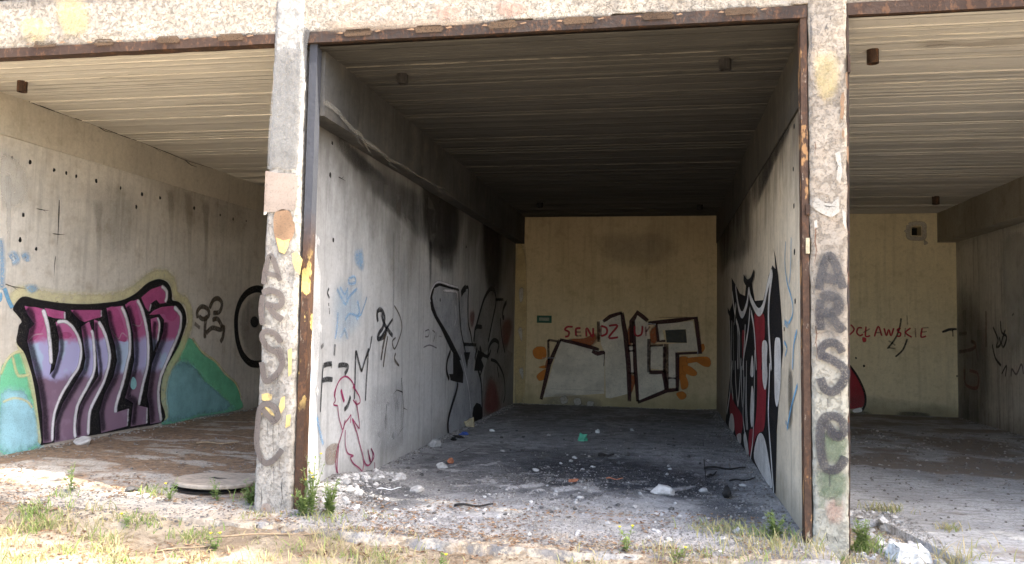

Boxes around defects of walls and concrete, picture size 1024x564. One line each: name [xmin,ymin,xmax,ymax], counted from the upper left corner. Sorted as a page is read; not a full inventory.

rust [340,19,471,31]
peeling [264,171,322,395]
peeling [261,393,291,428]